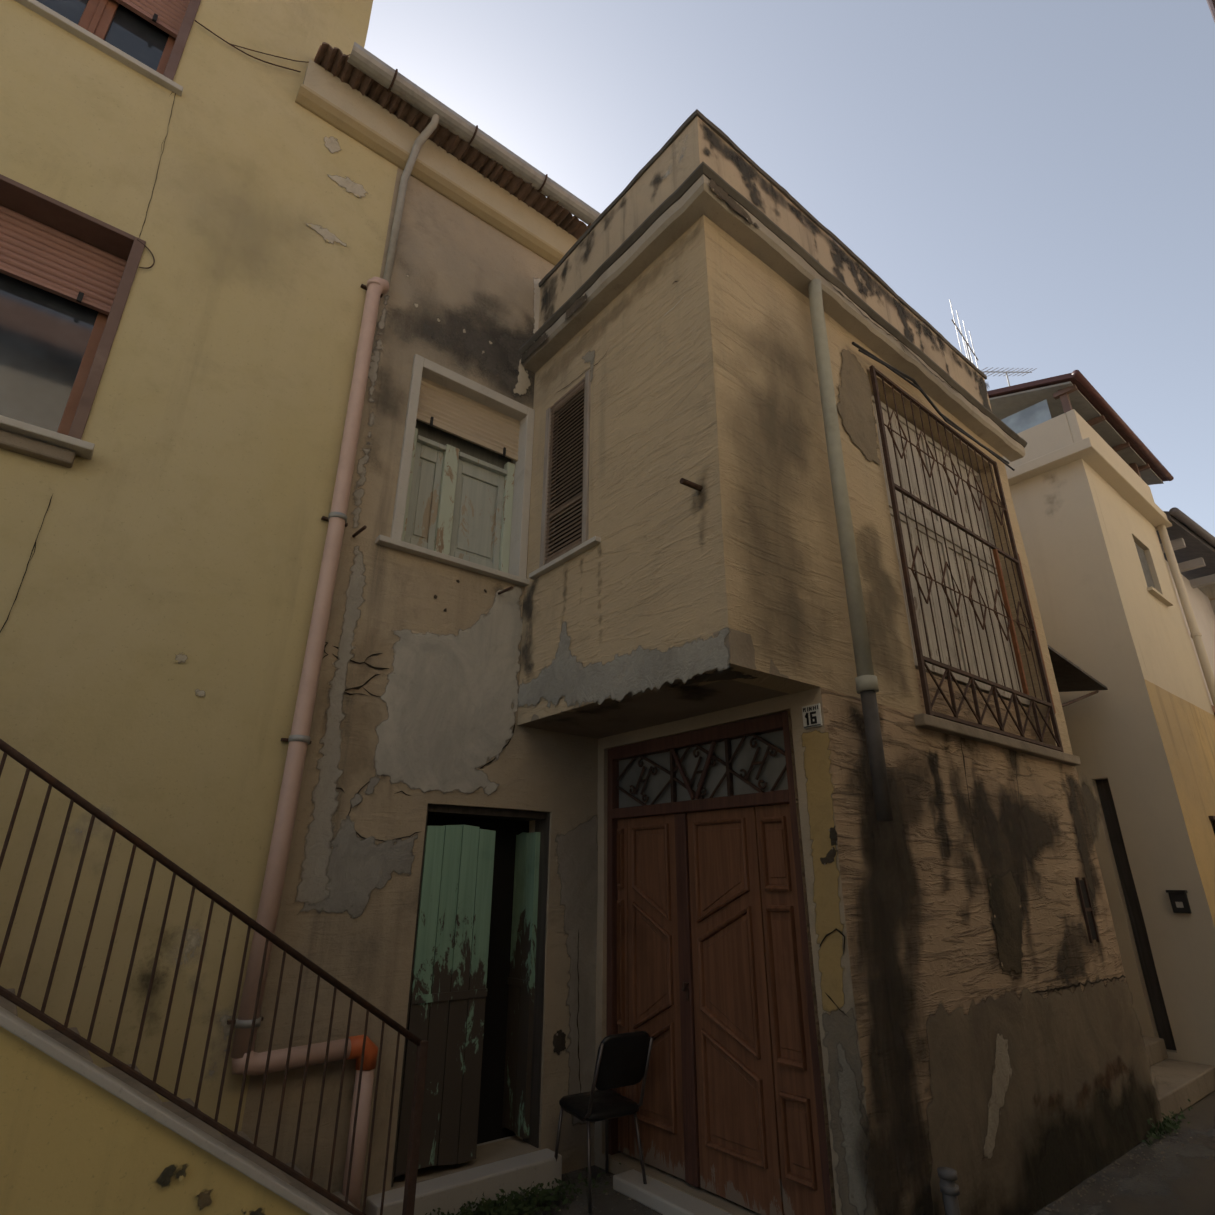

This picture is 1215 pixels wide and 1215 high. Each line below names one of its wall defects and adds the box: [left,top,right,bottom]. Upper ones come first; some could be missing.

crack [0,497,52,632]
flaking render [669,667,758,688]
flaking render [820,826,838,865]
water stain [1057,767,1103,984]
water stain [850,708,1059,1215]
flaking render [156,1164,188,1187]
flaking render [195,1189,213,1210]
peeling [837,1043,867,1215]
water stain [1001,1073,1160,1215]